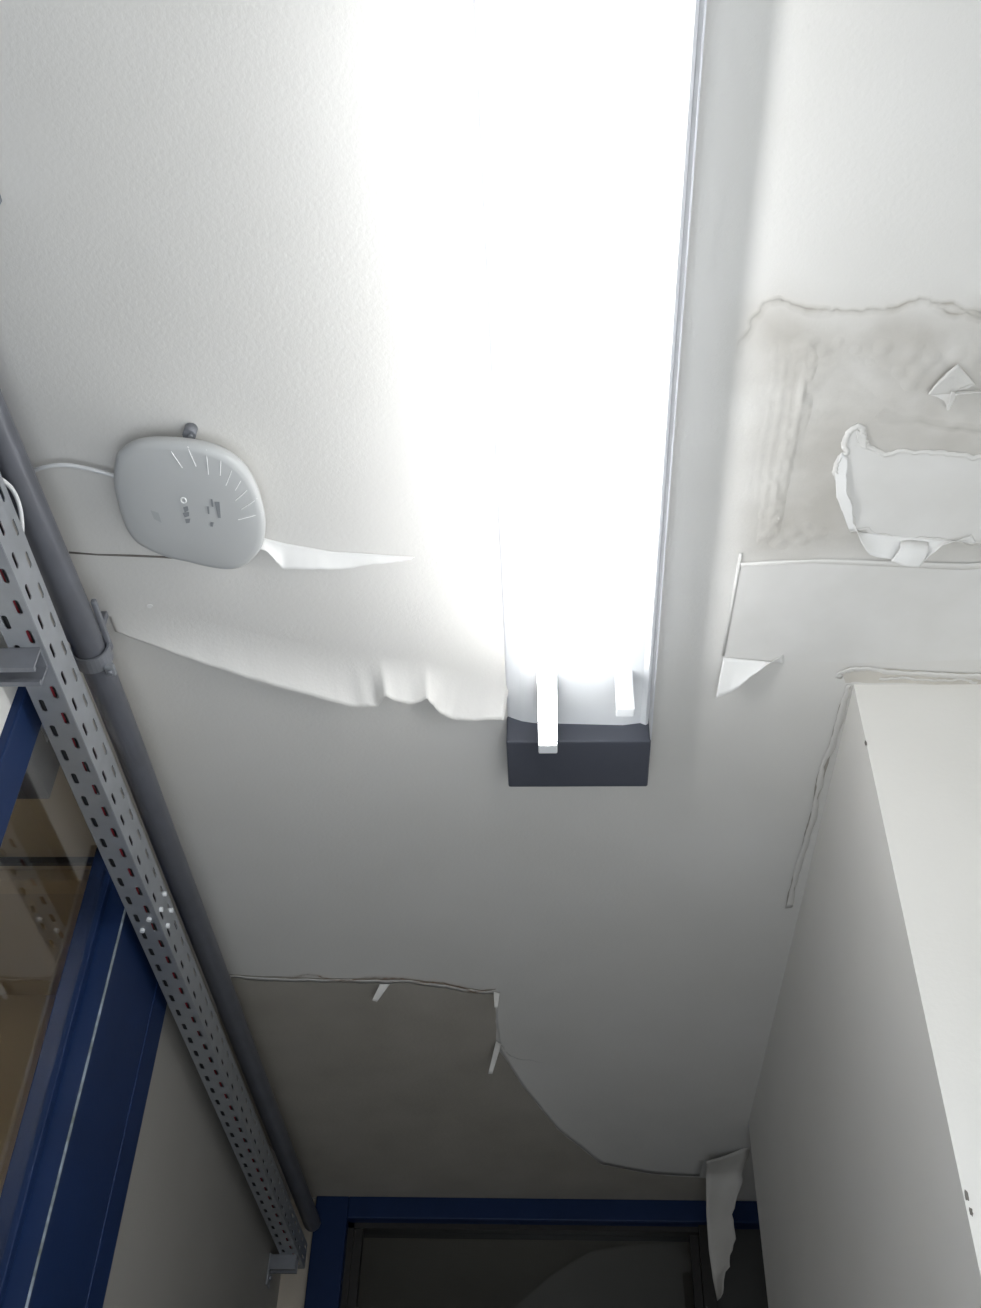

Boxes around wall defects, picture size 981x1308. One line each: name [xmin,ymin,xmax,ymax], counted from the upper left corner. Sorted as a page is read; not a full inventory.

peeling [832,423,981,567]
peeling [109,604,508,722]
flaking render [229,974,750,1301]